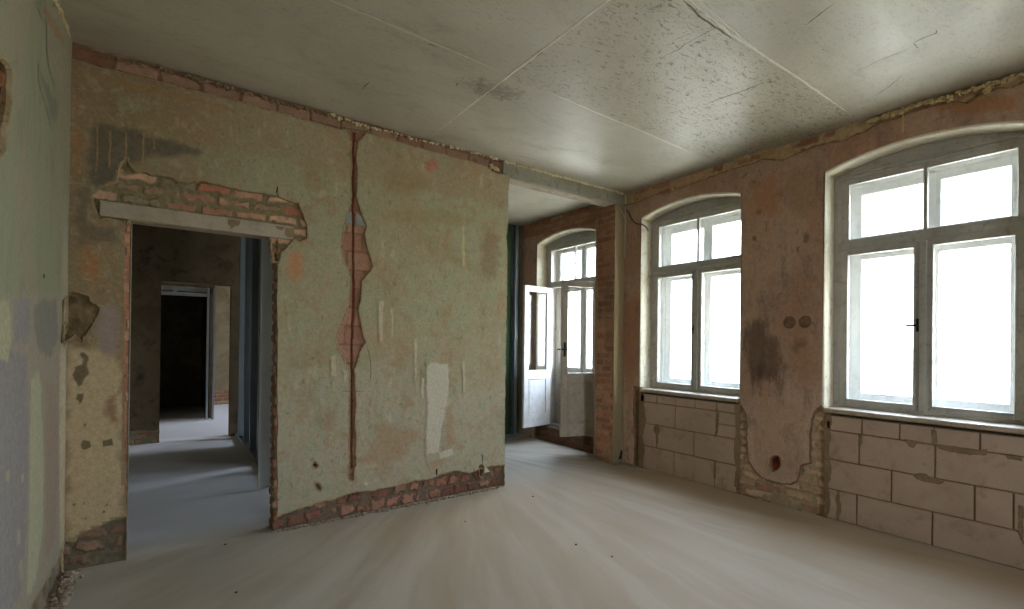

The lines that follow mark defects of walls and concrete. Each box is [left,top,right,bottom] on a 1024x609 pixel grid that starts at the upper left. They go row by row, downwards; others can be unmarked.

spalling [0,56,13,160]
spalling [71,42,512,530]
flaking render [522,71,1024,466]
peeling [0,289,126,609]
spalling [735,402,831,517]